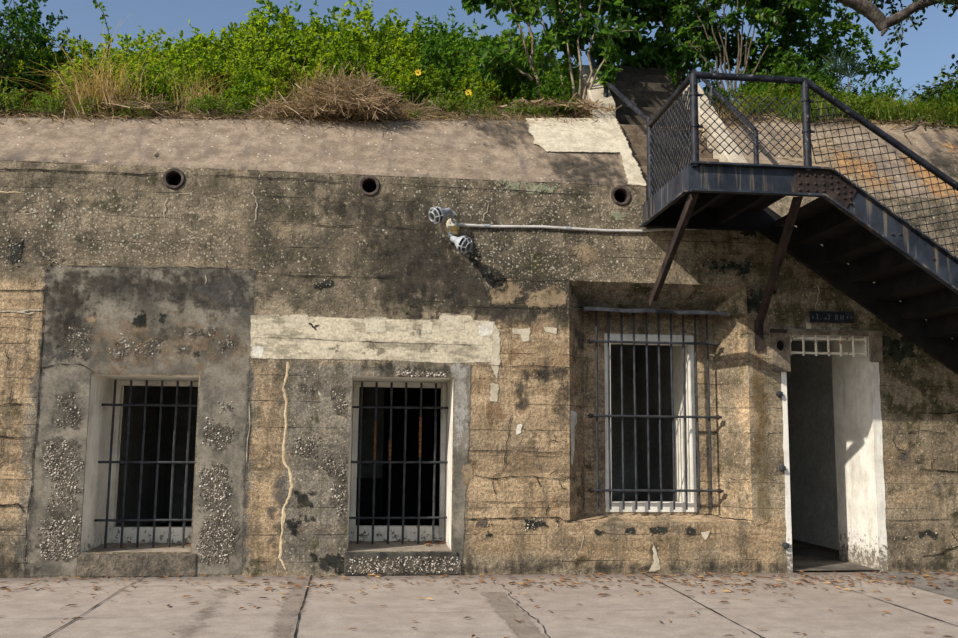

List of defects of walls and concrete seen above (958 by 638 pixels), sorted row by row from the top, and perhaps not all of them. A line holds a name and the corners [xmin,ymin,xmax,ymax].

crack [0,168,163,215]
crack [163,174,347,224]
crack [48,262,162,270]
water stain [39,263,257,364]
crack [185,266,397,278]
water stain [317,196,567,326]
peeling [489,279,567,309]
crack [364,341,583,368]
crack [0,290,93,563]
crack [278,361,294,570]
crack [464,413,611,526]
crack [895,519,958,557]